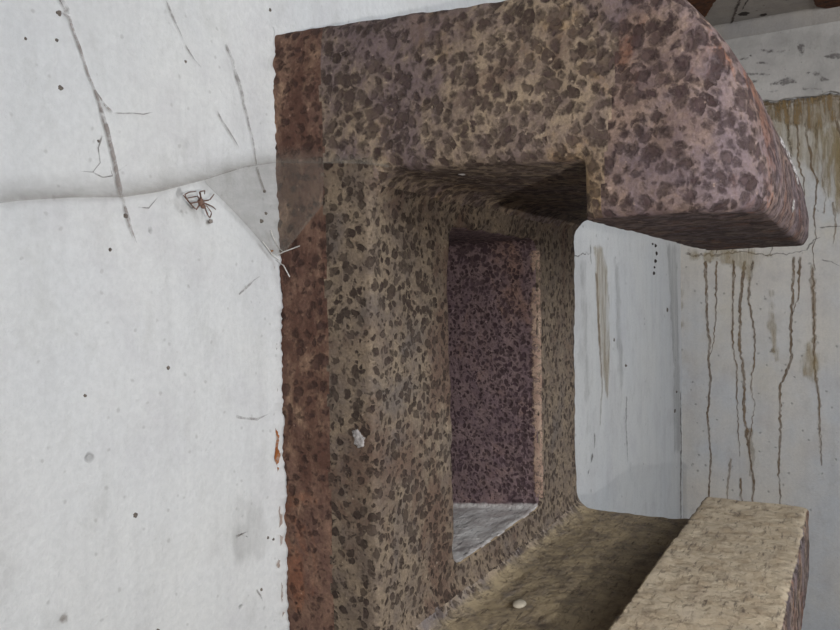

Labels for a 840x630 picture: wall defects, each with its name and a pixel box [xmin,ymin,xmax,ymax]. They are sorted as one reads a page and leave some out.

damp [770,99,840,267]
crack [677,394,685,517]